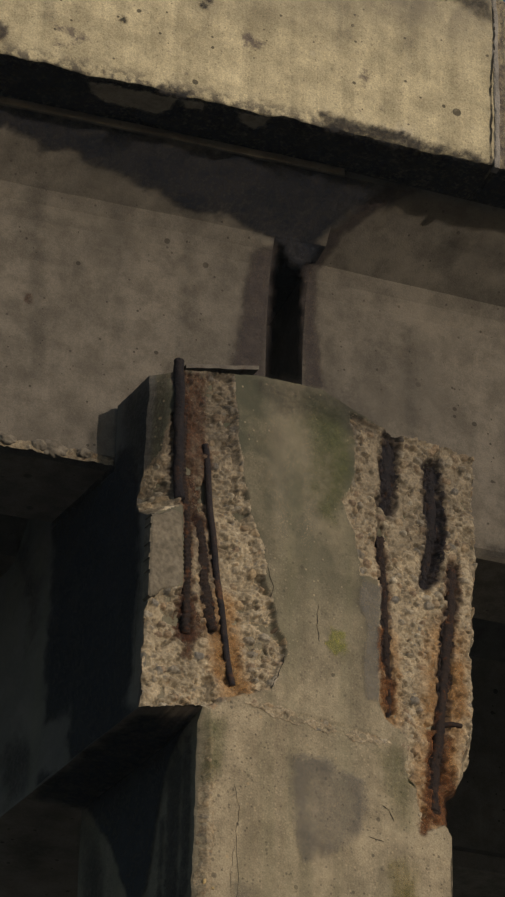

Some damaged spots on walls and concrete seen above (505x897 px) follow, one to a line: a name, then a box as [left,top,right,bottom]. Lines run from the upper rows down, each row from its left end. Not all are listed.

damp [0,54,505,388]
rust [173,596,206,657]
spalling [137,358,289,710]
spalling [340,411,478,833]
rust [420,730,456,836]